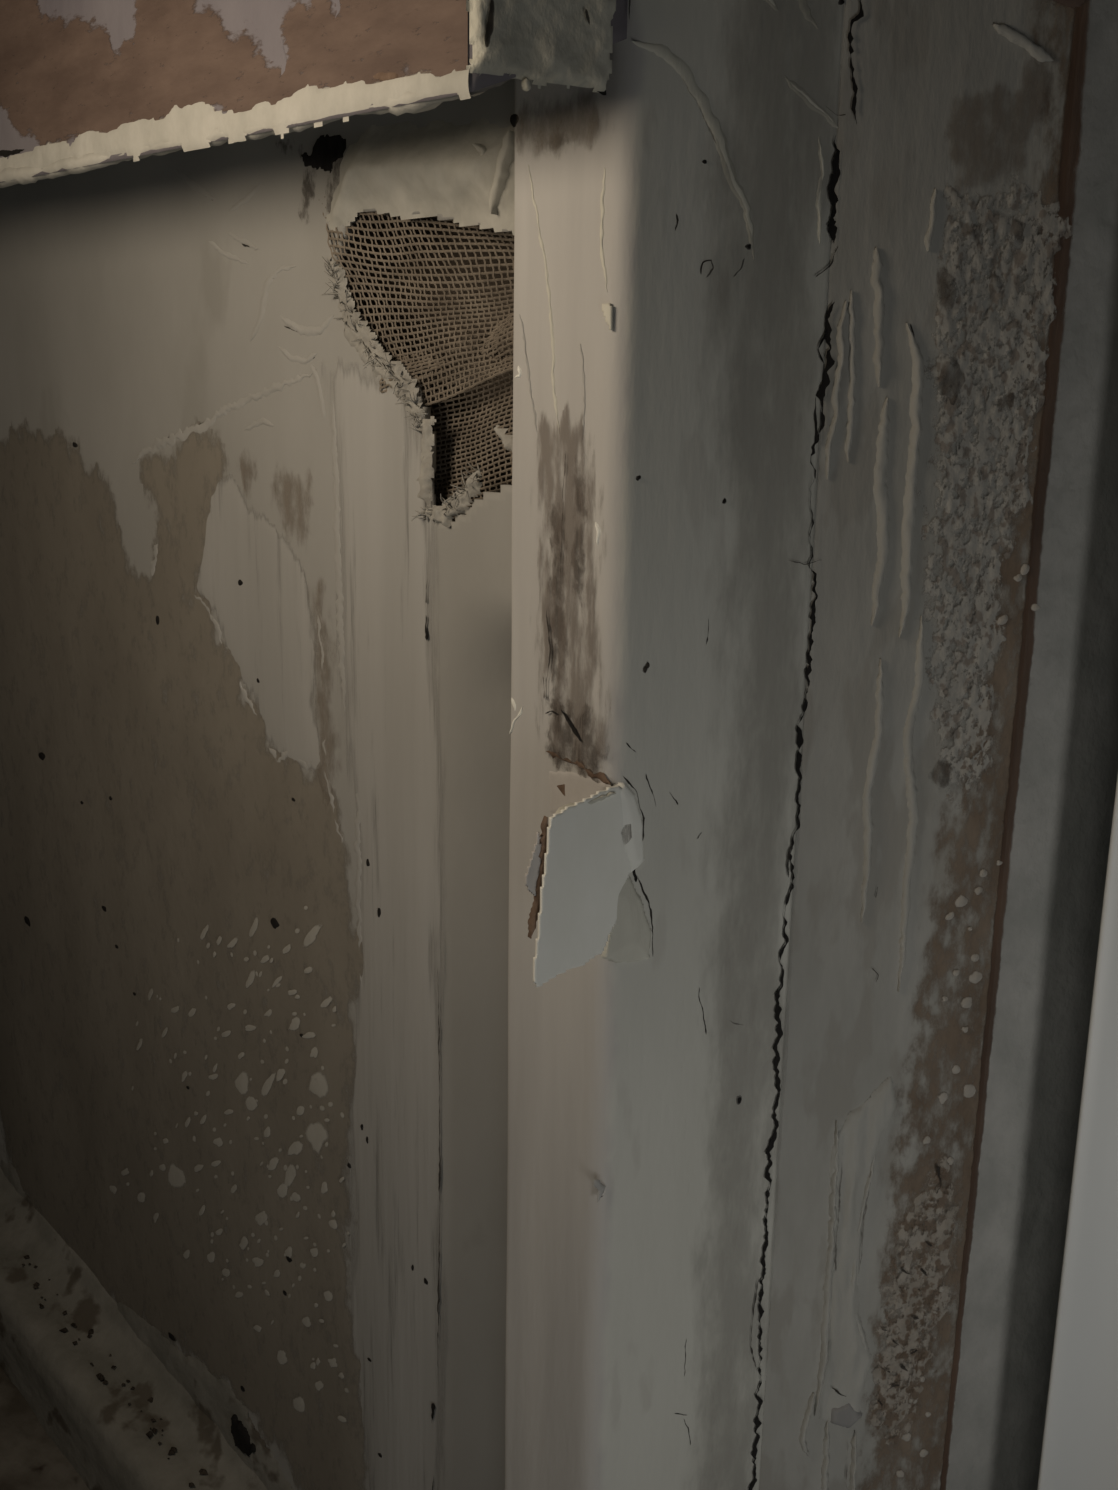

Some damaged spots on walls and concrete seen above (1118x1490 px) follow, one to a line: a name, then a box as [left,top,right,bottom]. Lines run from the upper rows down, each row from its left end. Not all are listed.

peeling [0,0,494,146]
spalling [322,207,521,527]
peeling [0,421,366,1490]
damp [539,407,604,783]
peeling [525,775,678,987]
crack [749,0,864,1490]